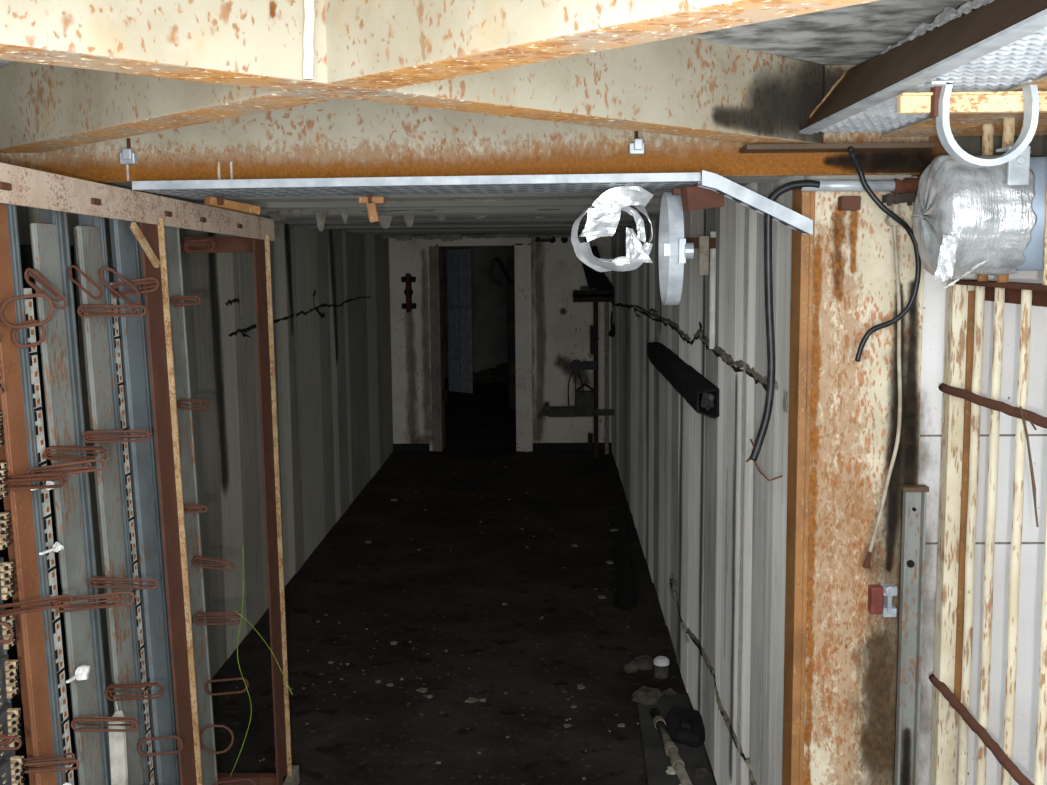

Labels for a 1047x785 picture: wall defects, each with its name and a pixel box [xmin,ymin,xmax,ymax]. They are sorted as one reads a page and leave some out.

crack [225,290,371,338]
rust [15,146,918,182]
rust [803,207,858,785]
leakage [862,393,927,785]